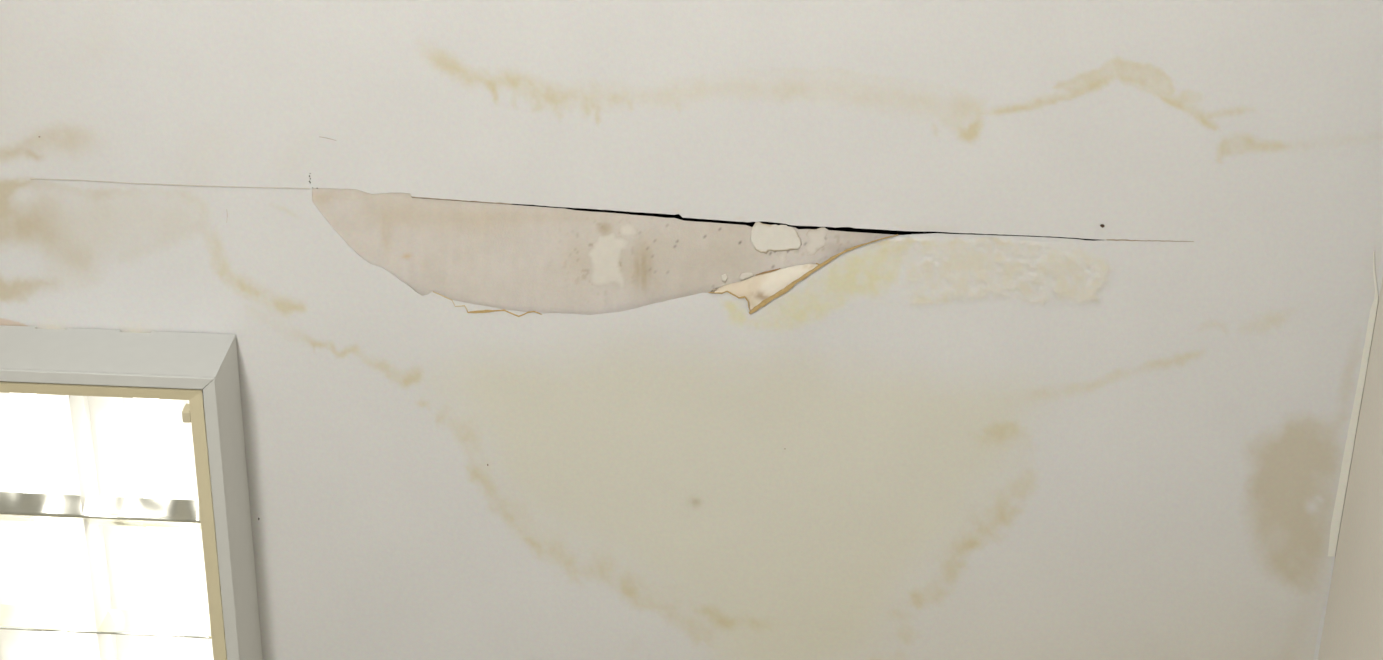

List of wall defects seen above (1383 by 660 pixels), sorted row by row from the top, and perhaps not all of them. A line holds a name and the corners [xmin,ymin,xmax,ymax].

damp [411,32,1383,168]
peeling [312,188,898,317]
crack [369,193,1194,242]
damp [714,236,910,336]
damp [0,117,795,657]
damp [858,302,1303,660]
damp [1234,321,1365,660]